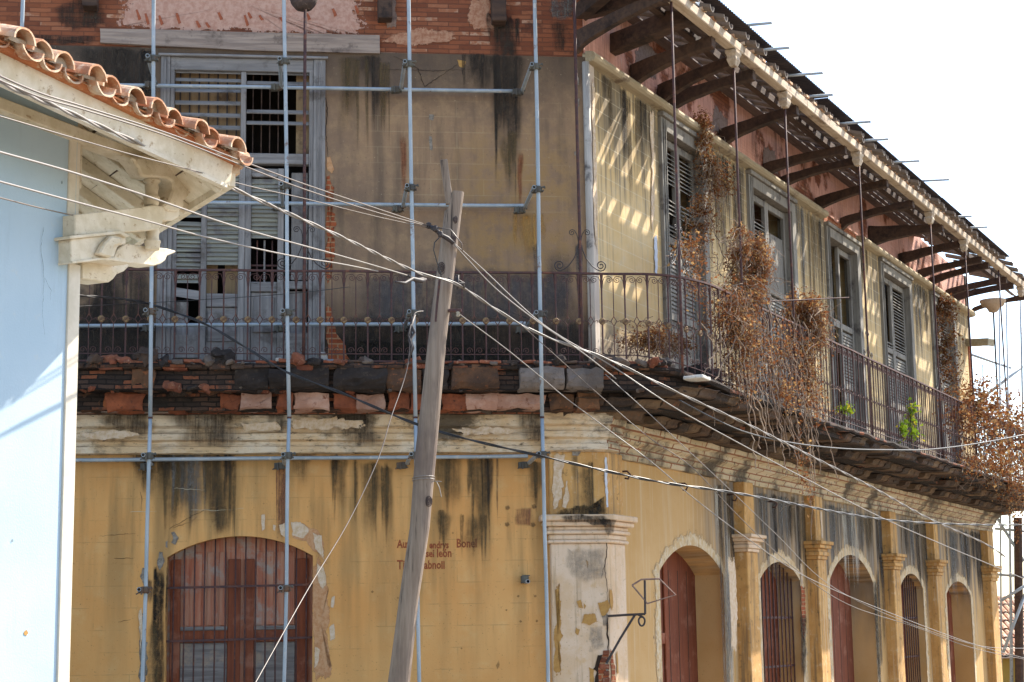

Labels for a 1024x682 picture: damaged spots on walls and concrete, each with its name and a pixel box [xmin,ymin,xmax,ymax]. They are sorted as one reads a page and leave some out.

flaking render [116,0,368,35]
water stain [382,27,456,46]
water stain [462,0,522,188]
flaking render [241,416,365,431]
water stain [135,415,236,530]
water stain [332,454,390,527]
water stain [437,459,498,550]
peeling [552,451,581,510]
water stain [148,569,168,682]
peeling [261,514,335,681]
peeling [553,583,613,676]
spalling [589,649,619,682]